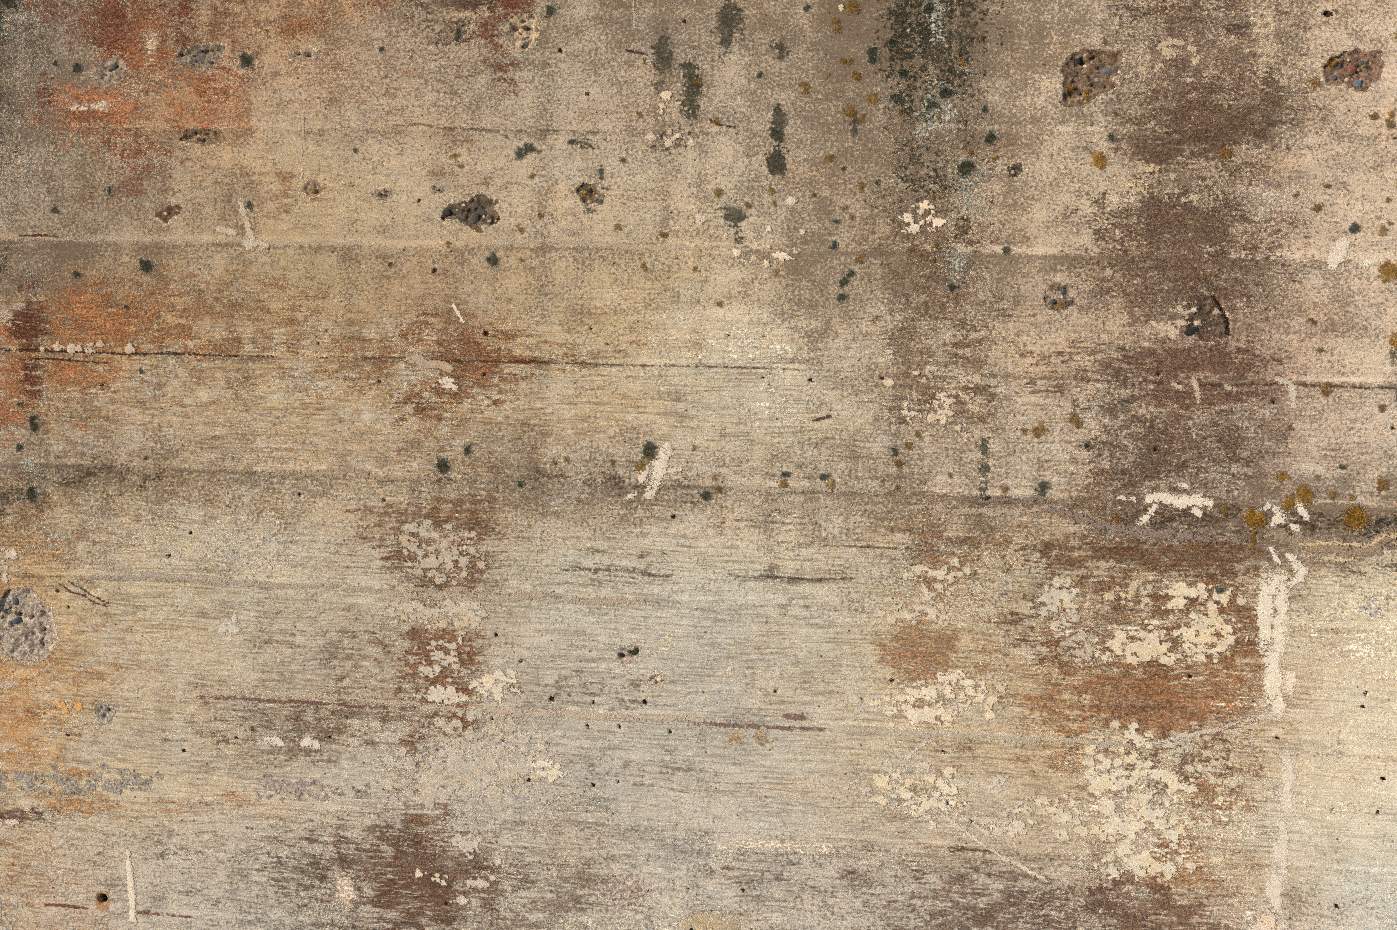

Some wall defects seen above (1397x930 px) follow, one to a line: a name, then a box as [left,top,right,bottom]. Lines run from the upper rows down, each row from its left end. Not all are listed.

corrosion [0,0,430,228]
spalling [1319,44,1390,95]
spalling [430,185,504,230]
water stain [645,309,815,424]
water stain [833,0,1343,621]
corrosion [0,261,646,930]
water stain [159,609,698,829]
peeling [345,519,598,820]
peeling [1026,571,1258,668]
water stain [34,795,388,930]
water stain [464,847,750,930]
peeling [861,721,1258,883]